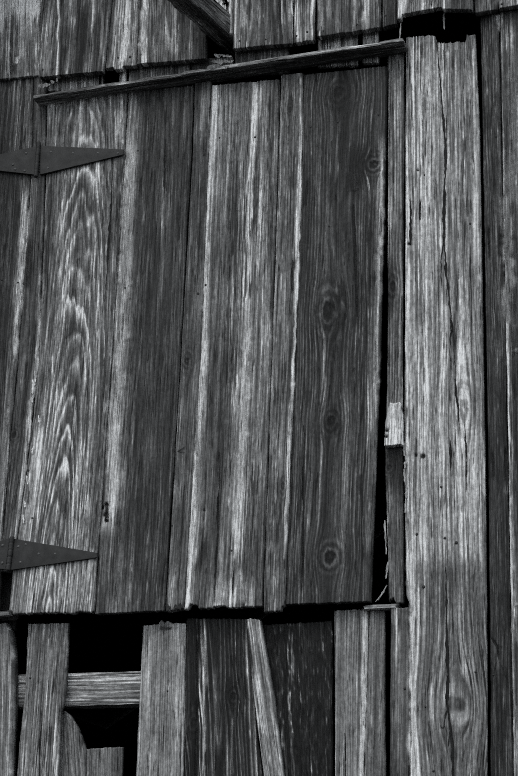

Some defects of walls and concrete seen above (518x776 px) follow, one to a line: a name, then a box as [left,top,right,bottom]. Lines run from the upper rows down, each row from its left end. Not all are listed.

crack [409,199,421,245]
crack [436,39,467,489]